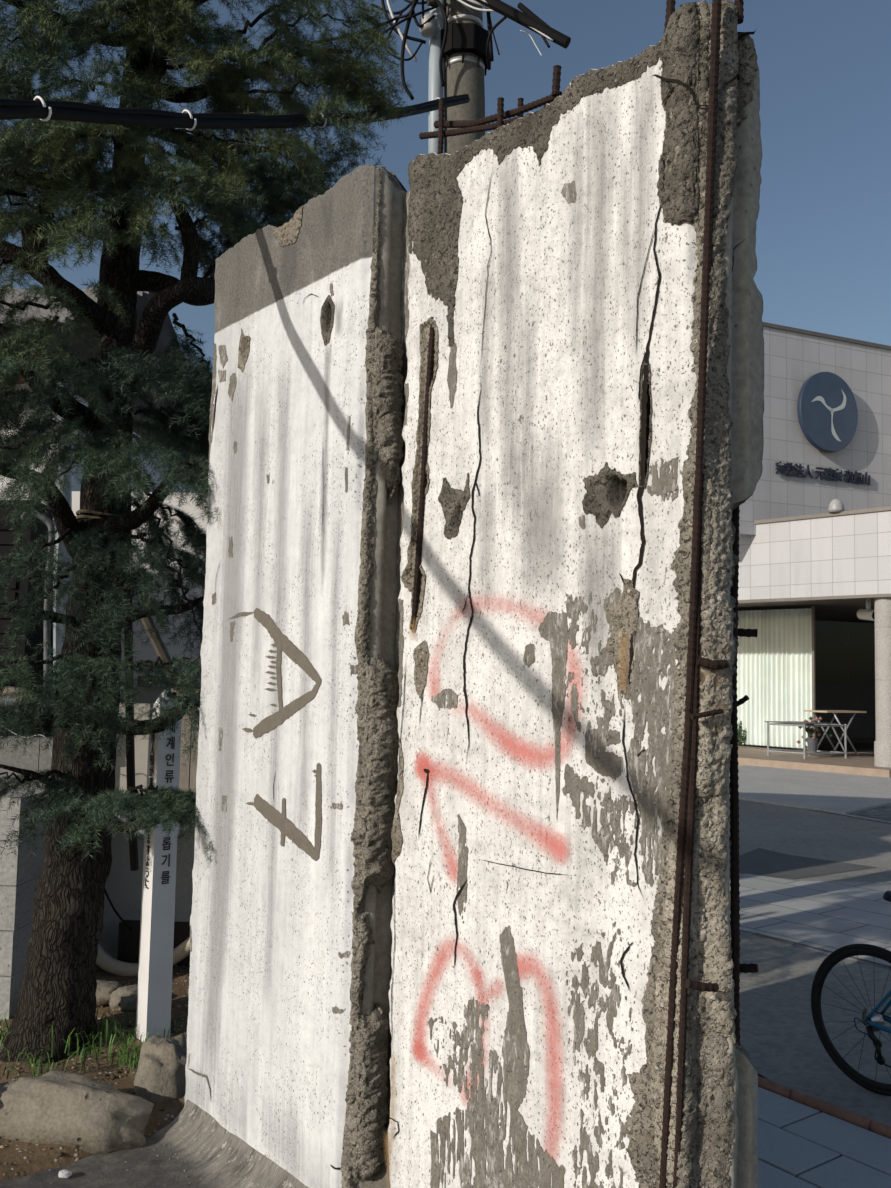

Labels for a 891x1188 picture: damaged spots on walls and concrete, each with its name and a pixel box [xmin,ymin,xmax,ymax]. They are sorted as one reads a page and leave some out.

crack [738,30,756,40]
crack [653,73,740,129]
spalling [272,206,303,247]
spalling [367,169,383,329]
spalling [320,283,334,346]
crack [619,204,661,588]
spalling [342,354,378,675]
crack [461,166,493,768]
spalling [391,738,403,863]
spalling [332,896,366,1071]
spalling [340,1104,358,1188]